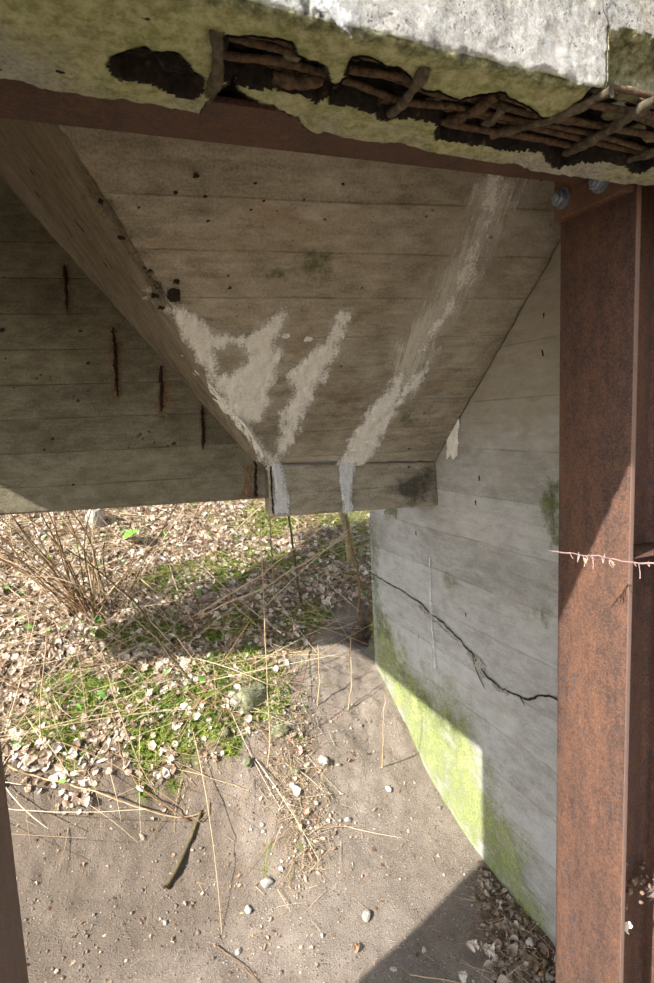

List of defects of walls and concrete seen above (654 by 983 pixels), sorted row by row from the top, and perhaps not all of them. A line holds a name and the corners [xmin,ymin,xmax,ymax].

spalling [106,26,654,175]
corrosion [110,327,119,396]
leakage [166,305,352,515]
leakage [336,173,532,514]
crack [368,571,557,706]